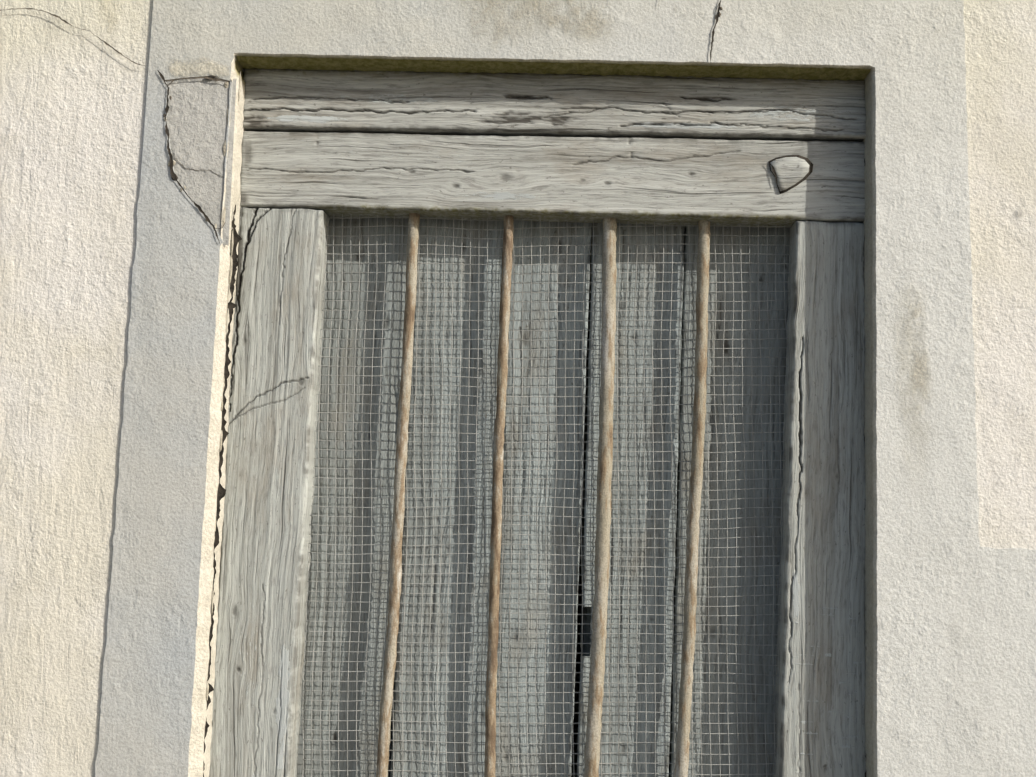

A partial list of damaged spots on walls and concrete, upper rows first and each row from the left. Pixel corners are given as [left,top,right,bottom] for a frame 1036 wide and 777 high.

crack [0,8,242,777]
crack [710,0,722,61]